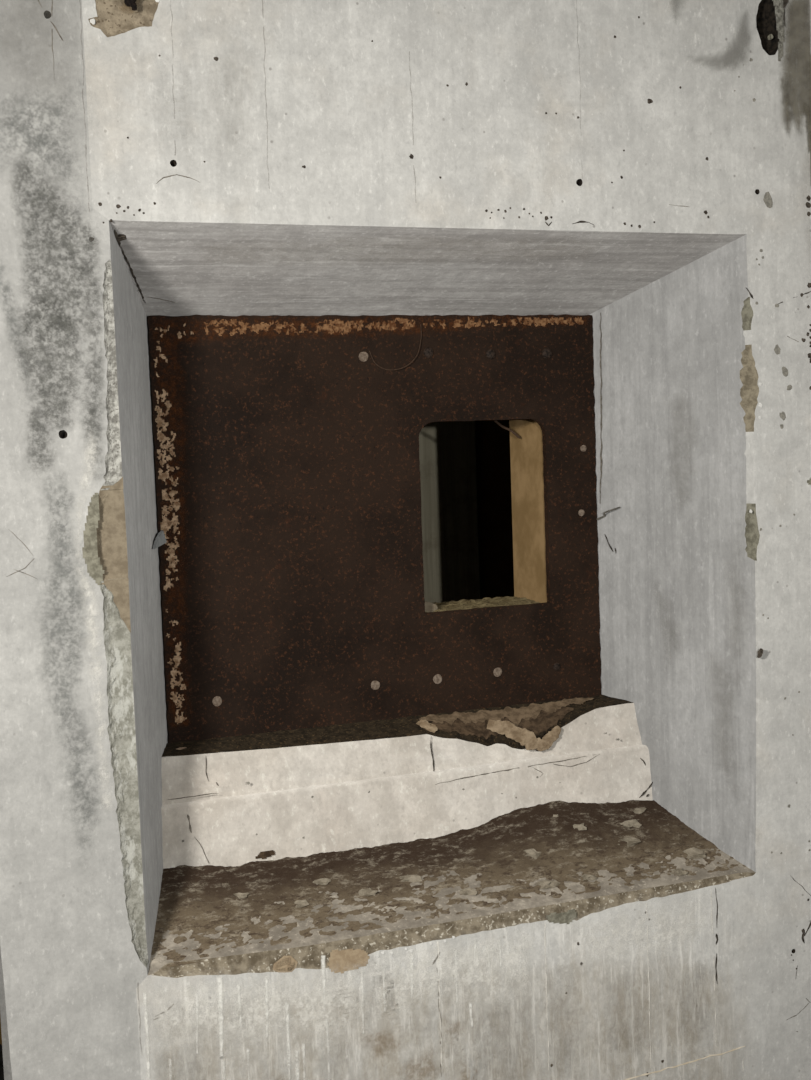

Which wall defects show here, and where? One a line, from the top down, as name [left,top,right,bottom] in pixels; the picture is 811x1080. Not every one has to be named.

spalling [88,0,160,37]
leakage [784,0,811,181]
leakage [17,166,101,480]
spalling [741,297,758,331]
spalling [740,344,762,432]
leakage [82,493,104,642]
rust [154,318,465,647]
spalling [96,260,755,978]
spalling [745,503,762,561]